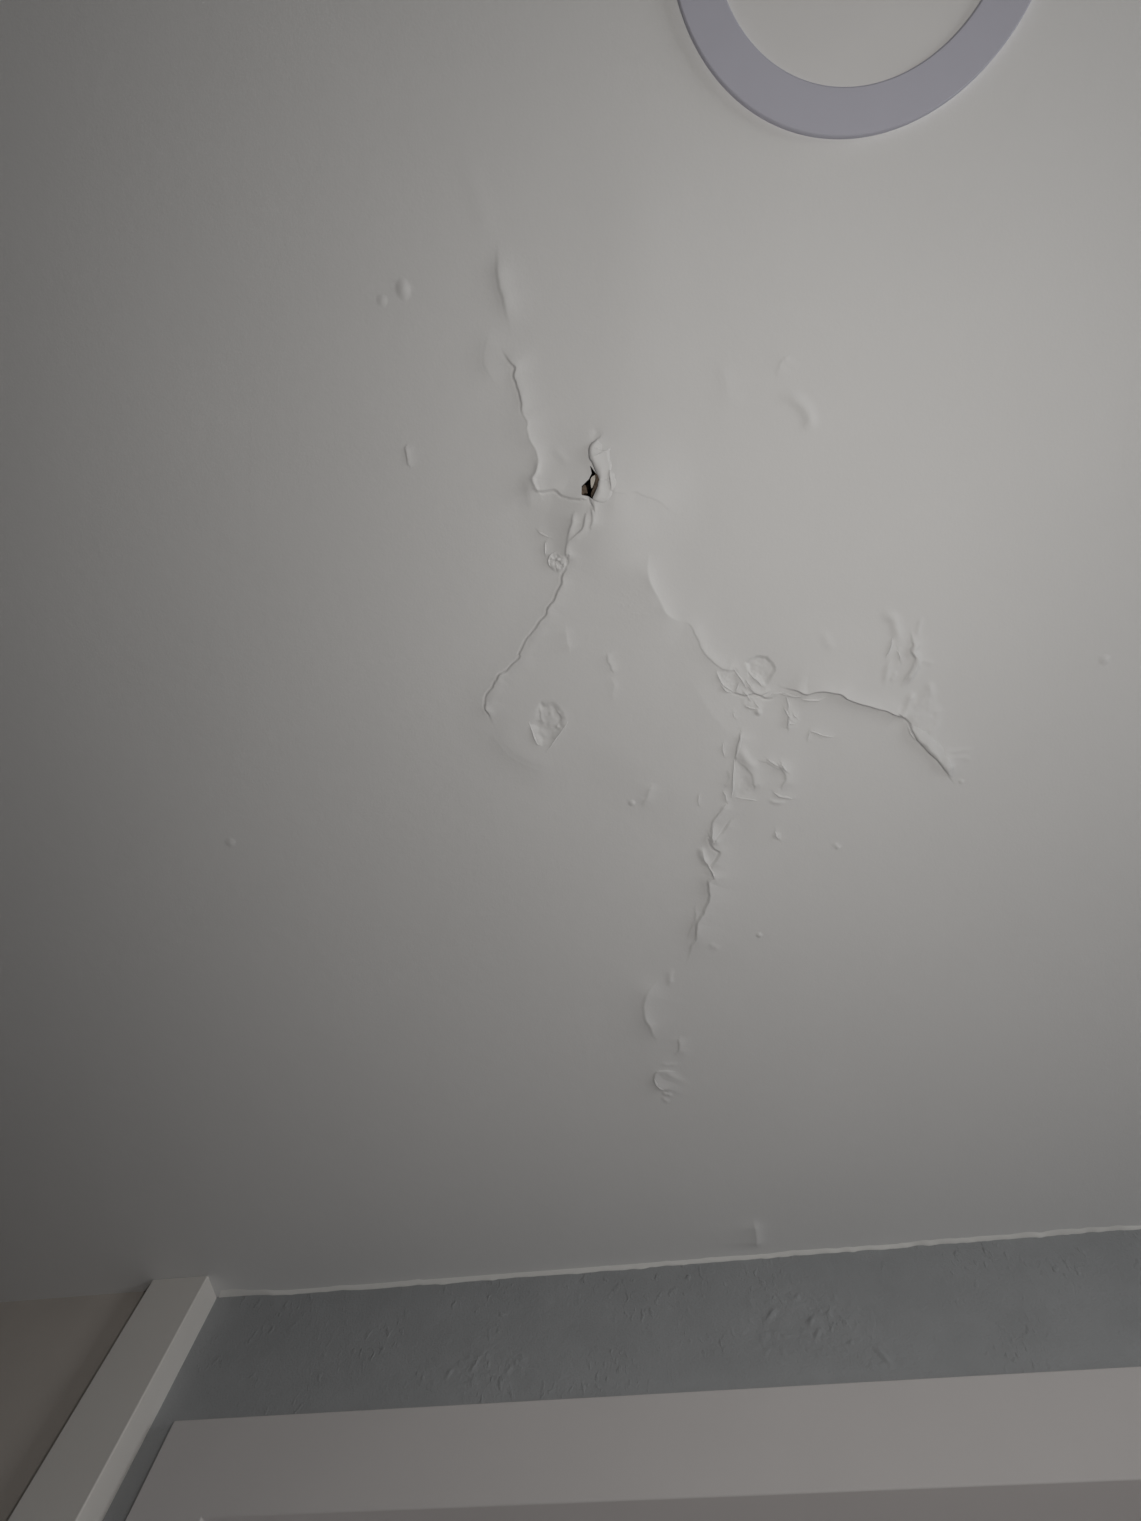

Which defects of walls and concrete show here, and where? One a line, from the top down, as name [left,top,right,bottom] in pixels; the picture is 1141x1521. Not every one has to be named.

crack [501,339,590,519]
crack [776,669,905,733]